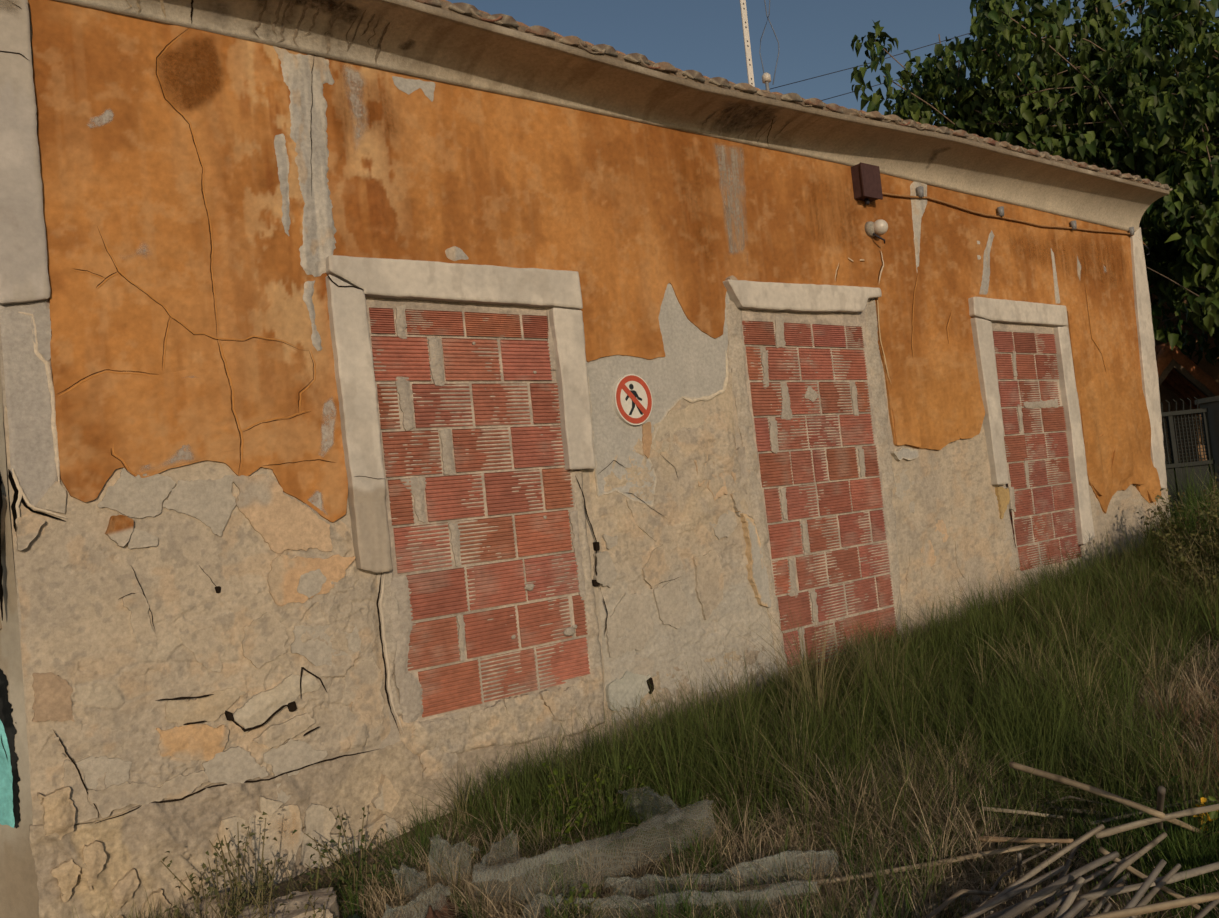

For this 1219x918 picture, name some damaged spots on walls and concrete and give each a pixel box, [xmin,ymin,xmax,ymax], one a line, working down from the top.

damp [161,40,220,108]
crack [56,0,382,479]
peeling [273,46,364,351]
damp [253,0,390,63]
flaking render [0,299,410,884]
crack [53,566,404,823]
flaking render [572,275,788,724]
flaking render [865,298,1020,640]
flaking render [1089,484,1168,559]
flaking render [51,840,107,902]
flaking render [111,868,206,918]